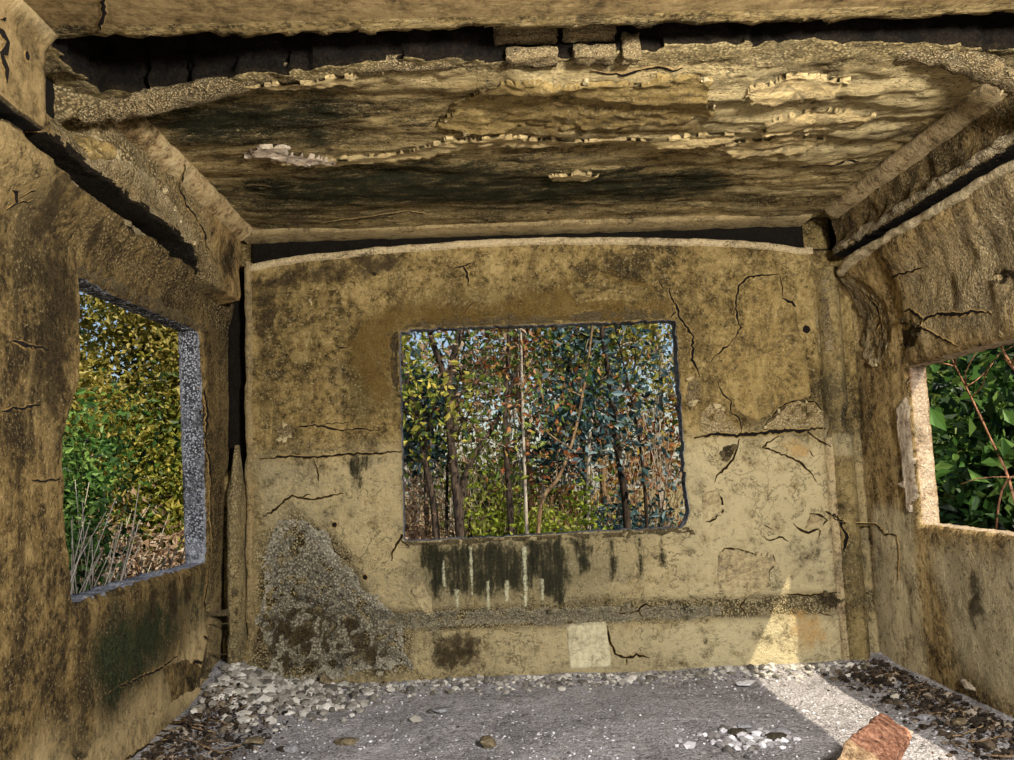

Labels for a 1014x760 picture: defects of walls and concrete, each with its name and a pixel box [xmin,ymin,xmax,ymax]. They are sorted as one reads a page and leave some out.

crack [0,16,10,83]
water stain [130,96,345,146]
spalling [74,53,478,245]
water stain [243,158,735,207]
peeling [244,25,876,168]
crack [658,273,831,523]
crack [259,422,402,517]
water stain [420,536,593,615]
spalling [254,519,776,680]
crack [607,602,653,665]
crack [719,511,900,616]